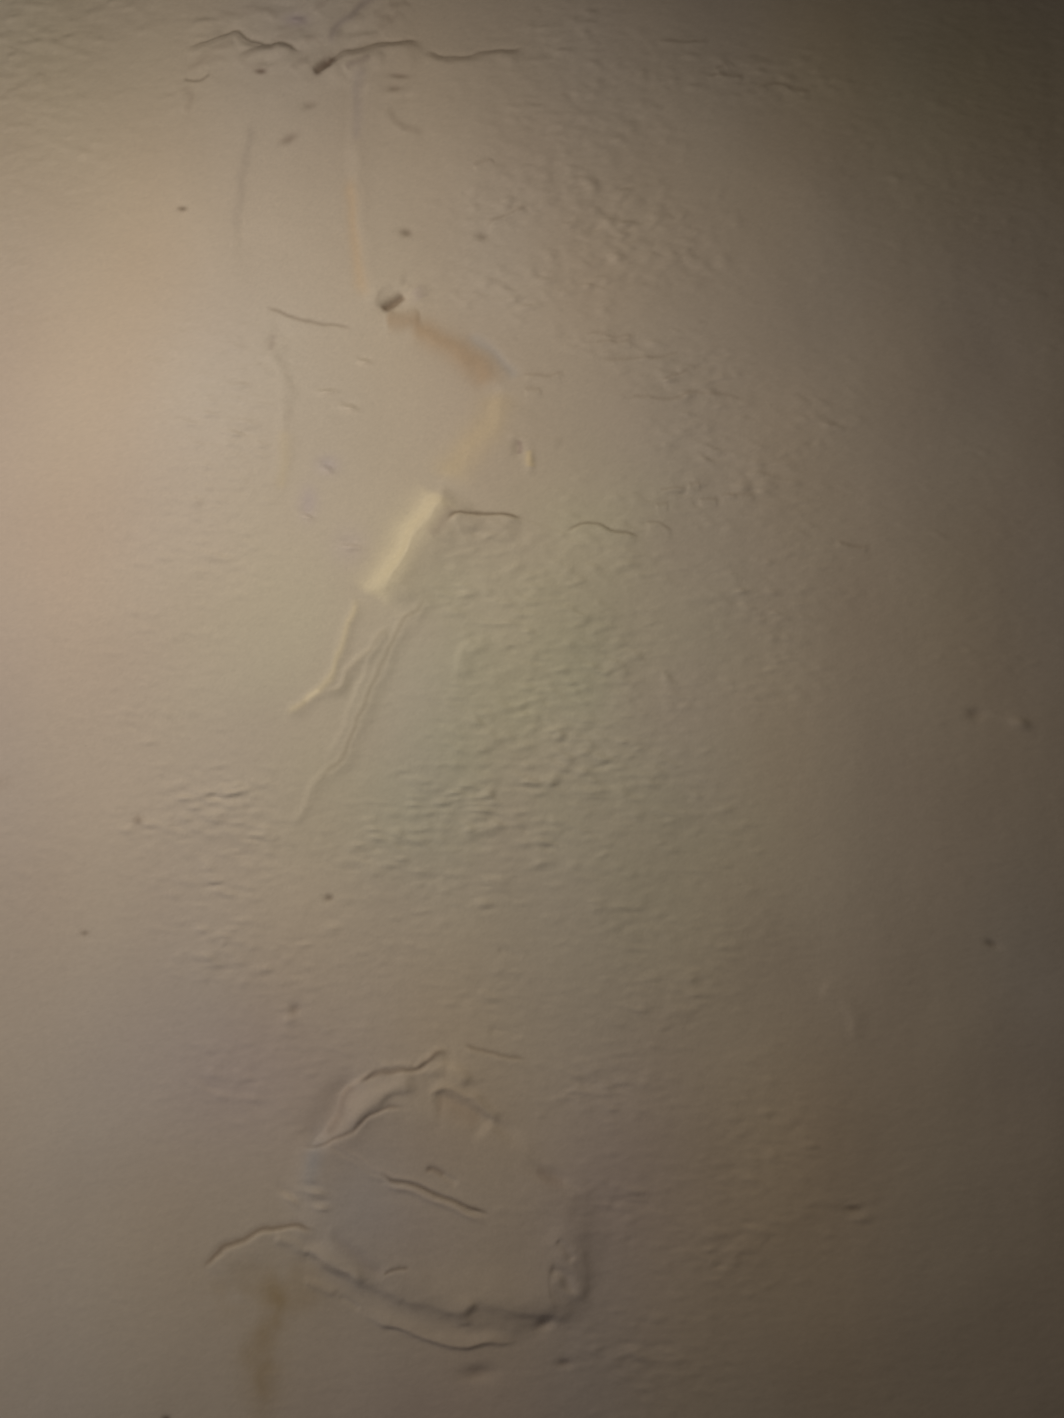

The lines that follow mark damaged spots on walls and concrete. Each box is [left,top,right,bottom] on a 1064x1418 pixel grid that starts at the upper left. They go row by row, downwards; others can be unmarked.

crack [169,0,540,86]